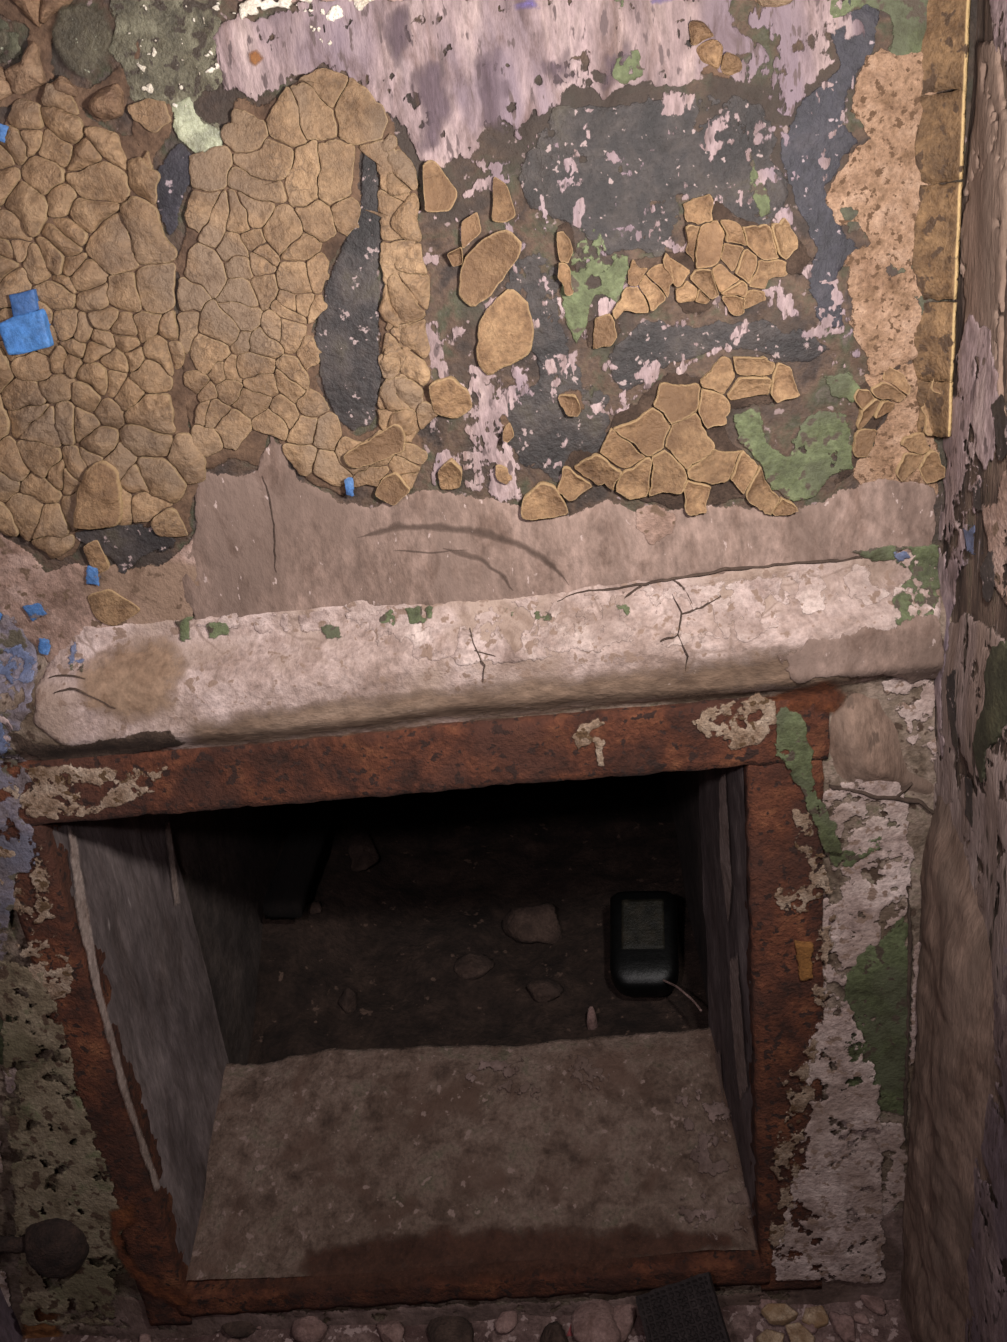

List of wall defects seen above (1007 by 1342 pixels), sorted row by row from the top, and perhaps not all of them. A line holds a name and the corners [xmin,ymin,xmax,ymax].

peeling [0,954,600,1339]
flaking render [0,0,1007,961]
crack [557,556,864,671]
corrosion [766,681,845,712]
peeling [692,693,921,1342]
peeling [882,612,1007,1342]